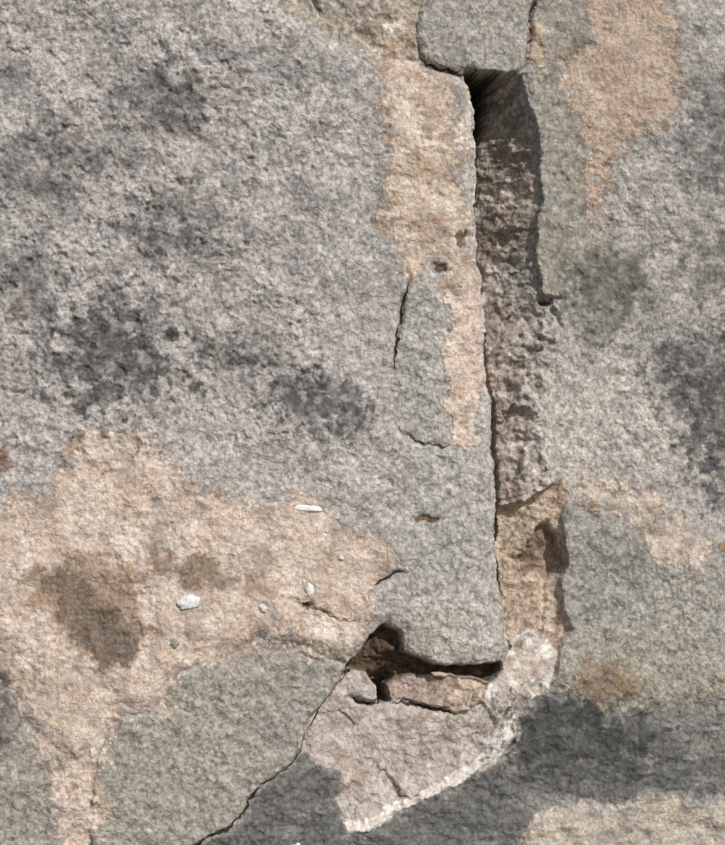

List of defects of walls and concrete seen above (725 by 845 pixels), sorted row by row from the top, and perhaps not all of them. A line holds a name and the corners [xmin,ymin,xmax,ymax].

crack [394,274,412,368]
spalling [0,423,517,845]
crack [197,672,454,845]